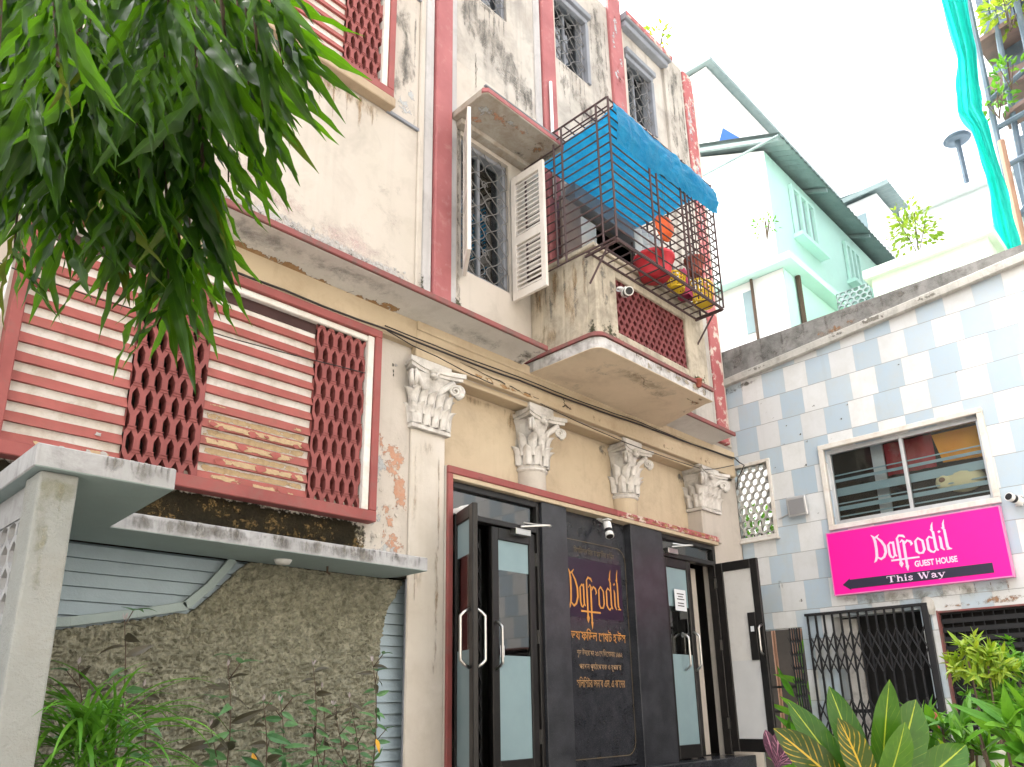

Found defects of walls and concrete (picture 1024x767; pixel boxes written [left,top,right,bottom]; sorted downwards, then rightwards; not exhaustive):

damp [462,0,532,106]
peeling [687,99,701,177]
peeling [201,404,307,495]
peeling [372,433,406,553]